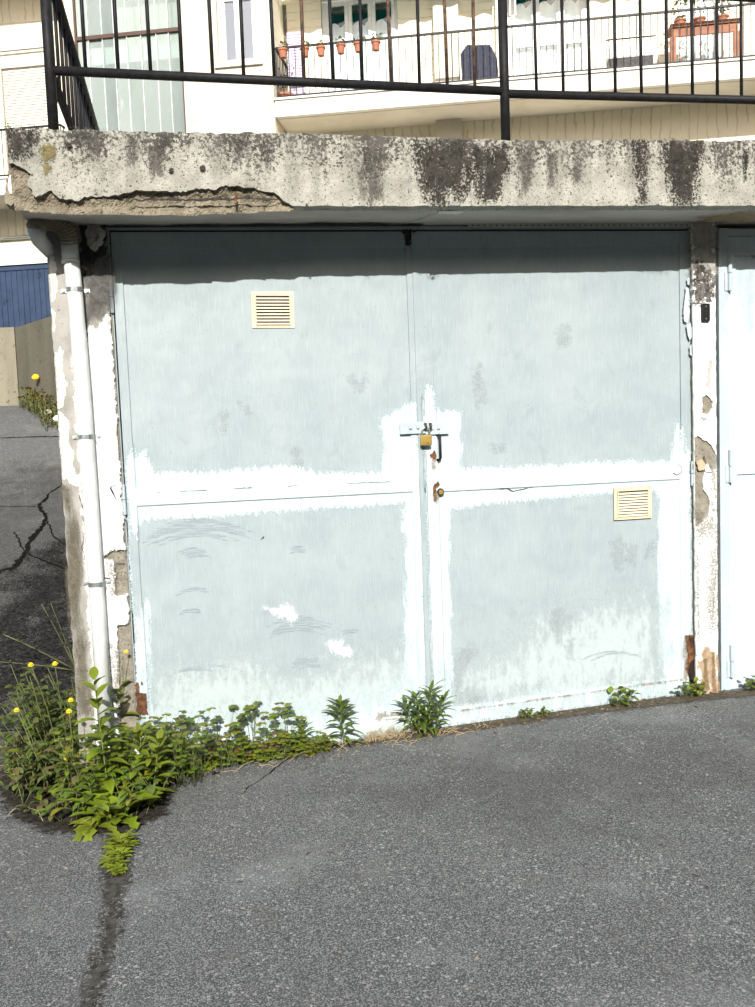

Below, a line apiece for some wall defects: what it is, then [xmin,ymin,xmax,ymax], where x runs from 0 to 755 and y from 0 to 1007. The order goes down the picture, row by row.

damp [2,122,40,162]
damp [125,134,174,178]
spalling [8,164,294,216]
damp [358,146,388,209]
damp [408,137,534,212]
damp [631,138,705,209]
damp [742,149,755,183]
damp [688,212,755,275]
peeling [700,395,712,421]
crack [0,482,86,574]
peeling [693,436,720,642]
corrosion [685,634,720,694]